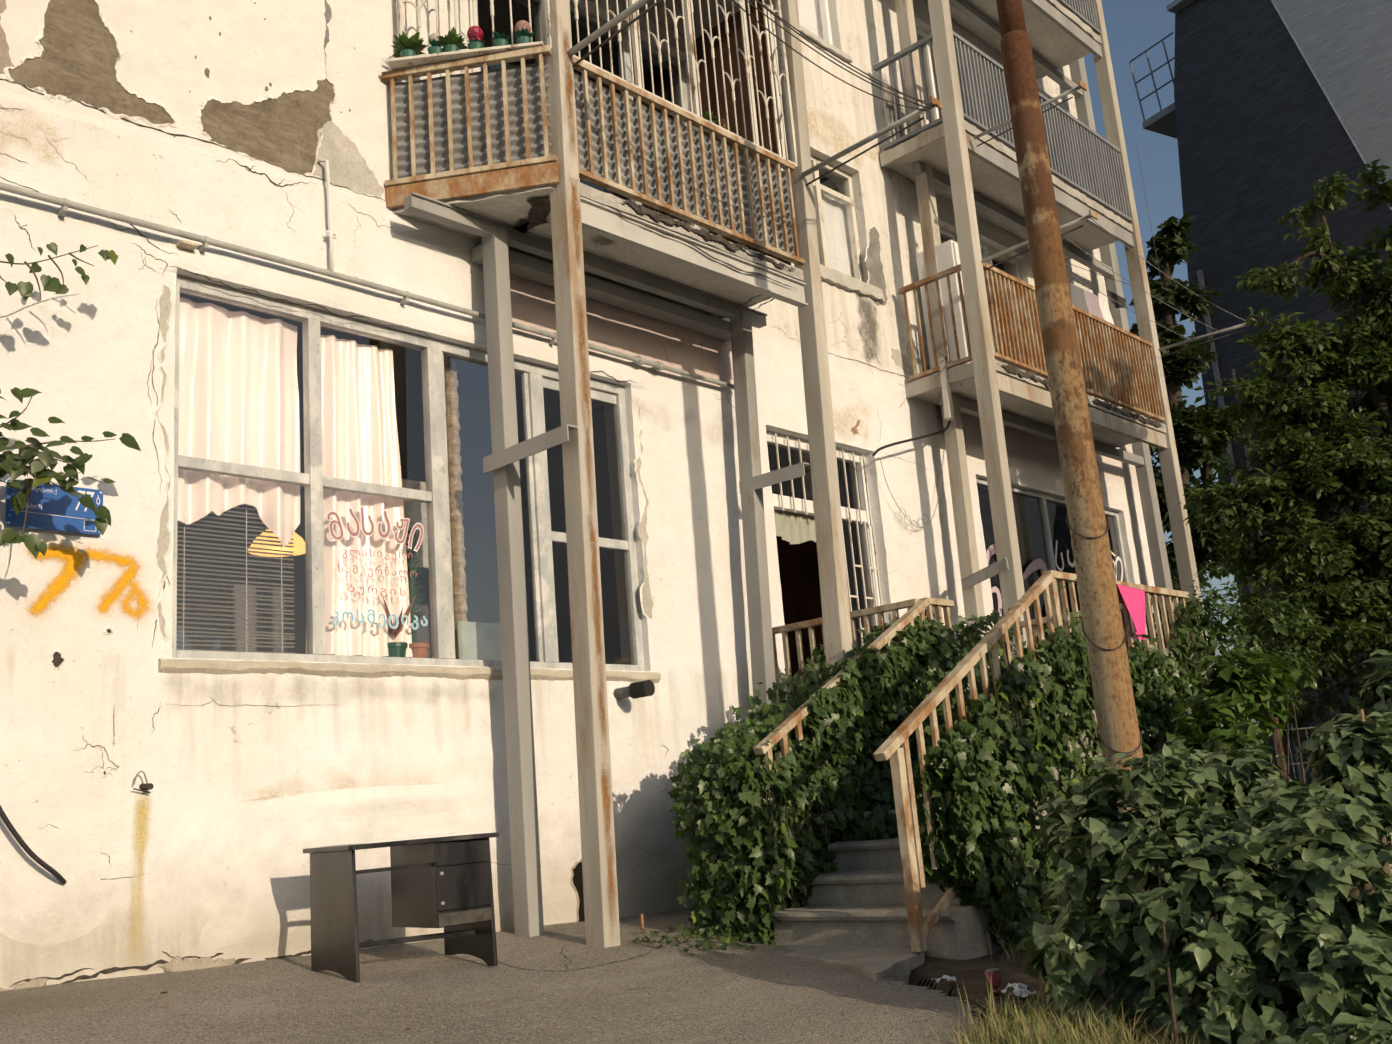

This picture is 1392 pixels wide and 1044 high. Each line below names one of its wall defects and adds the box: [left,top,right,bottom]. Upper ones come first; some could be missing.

flaking render [0,0,178,138]
crack [0,79,402,250]
flaking render [189,75,384,199]
spalling [512,196,551,234]
peeling [865,227,888,308]
crack [107,218,475,487]
peeling [48,649,66,671]
corrosion [590,522,605,731]
crack [82,715,119,777]
corrosion [137,801,148,876]
corrosion [602,772,614,908]
crack [10,950,311,987]